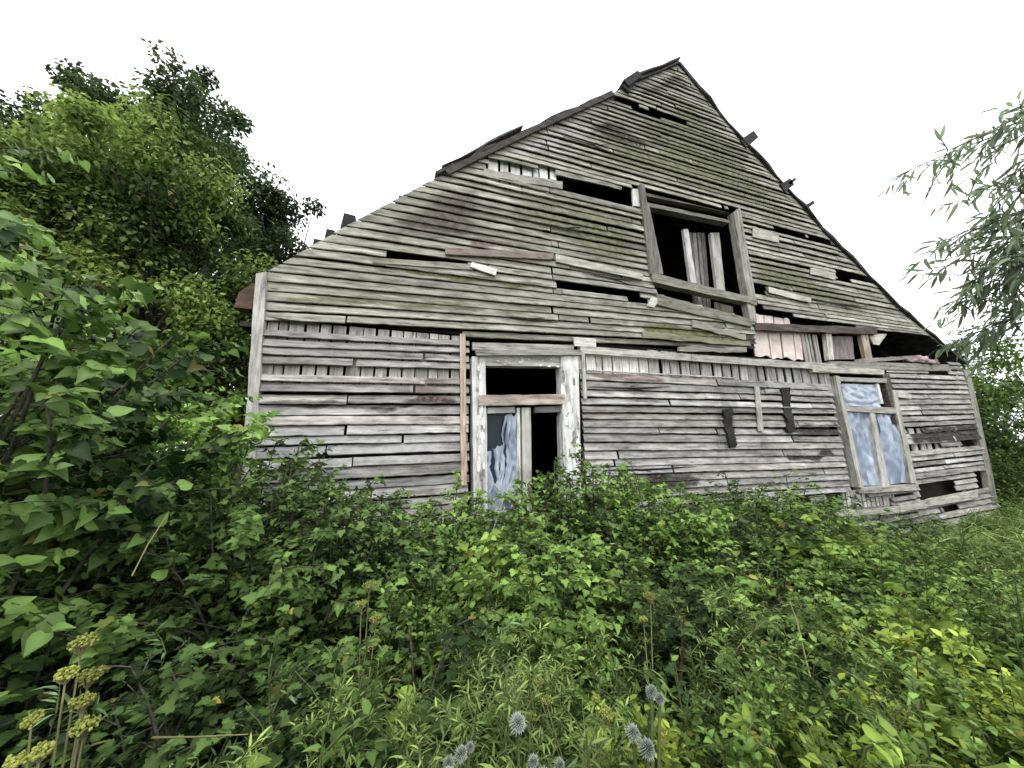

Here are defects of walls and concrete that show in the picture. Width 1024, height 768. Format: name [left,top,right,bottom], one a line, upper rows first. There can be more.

damp [590,105,780,213]
damp [519,199,633,259]
damp [644,323,755,348]